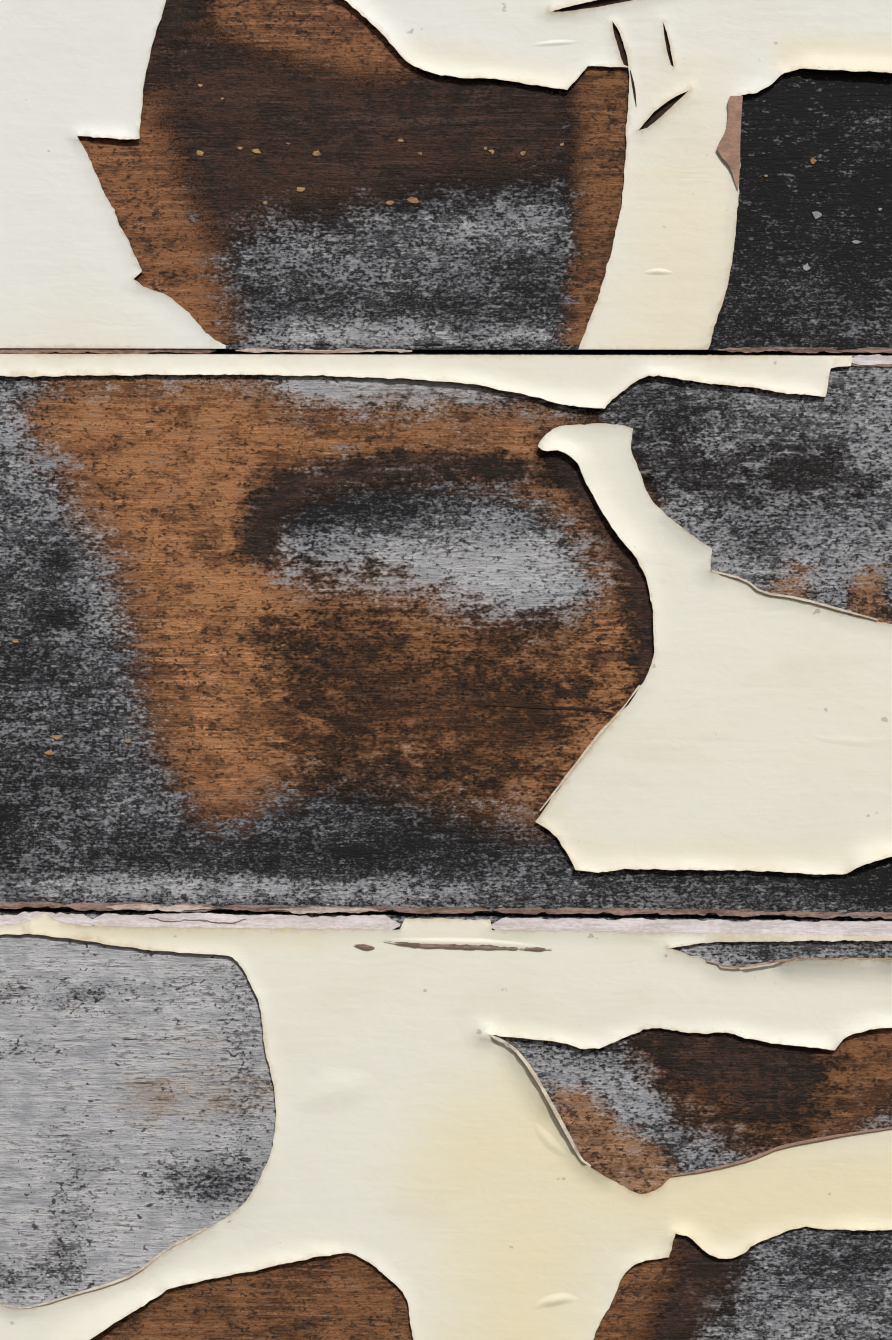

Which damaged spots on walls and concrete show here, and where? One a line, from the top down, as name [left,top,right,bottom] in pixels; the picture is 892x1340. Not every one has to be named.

crack [552,0,688,131]
peeling [0,0,892,930]
peeling [0,911,892,1340]